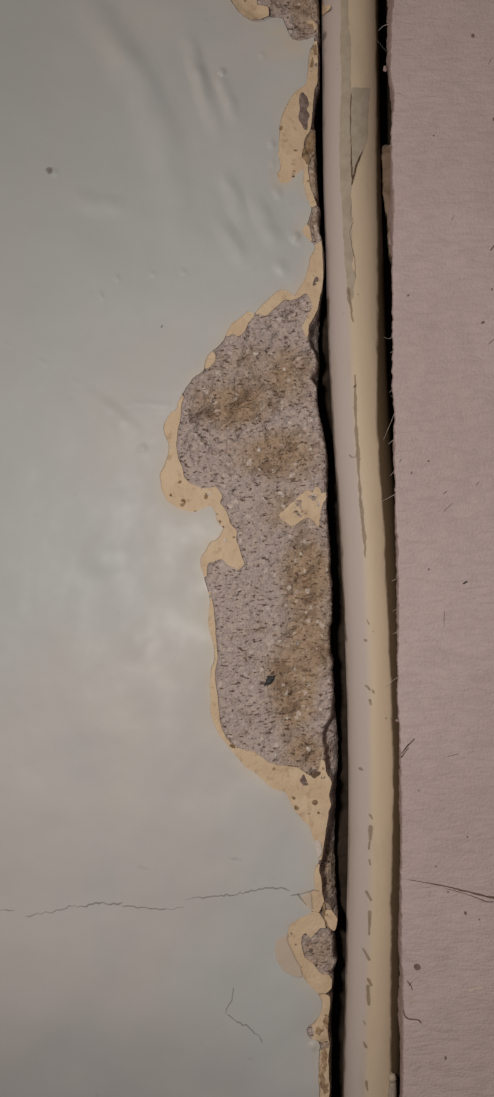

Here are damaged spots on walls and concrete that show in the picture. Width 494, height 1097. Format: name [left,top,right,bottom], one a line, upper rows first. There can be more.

spalling [160,0,370,1097]